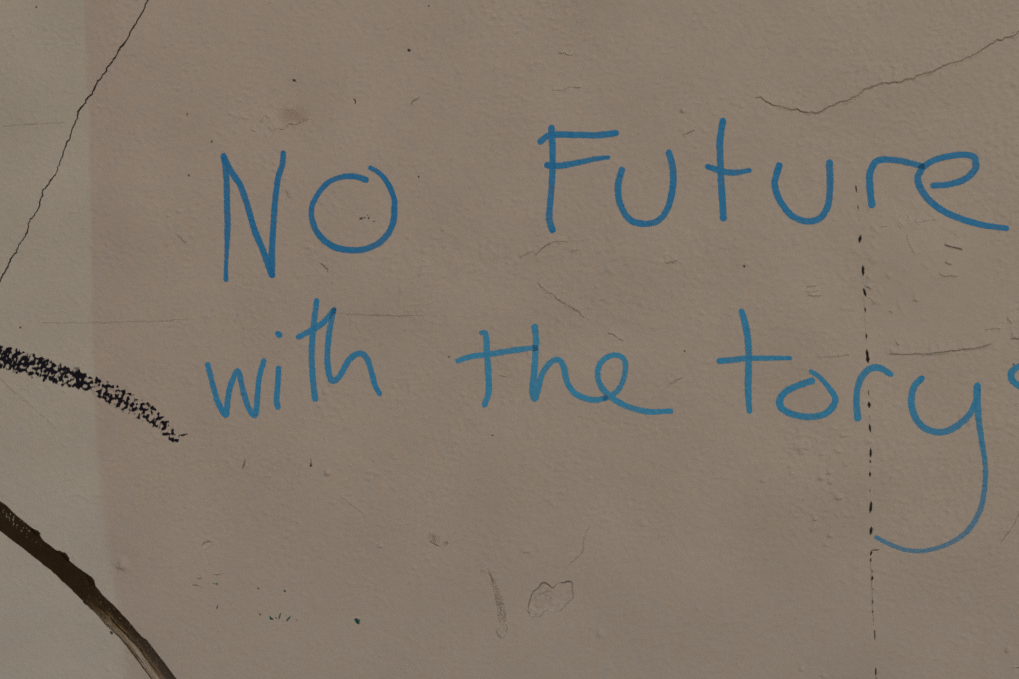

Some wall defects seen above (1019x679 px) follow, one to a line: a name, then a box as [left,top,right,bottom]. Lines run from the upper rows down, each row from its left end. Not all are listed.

crack [0,0,148,281]
crack [858,235,870,362]
crack [938,233,966,279]
crack [866,391,874,475]